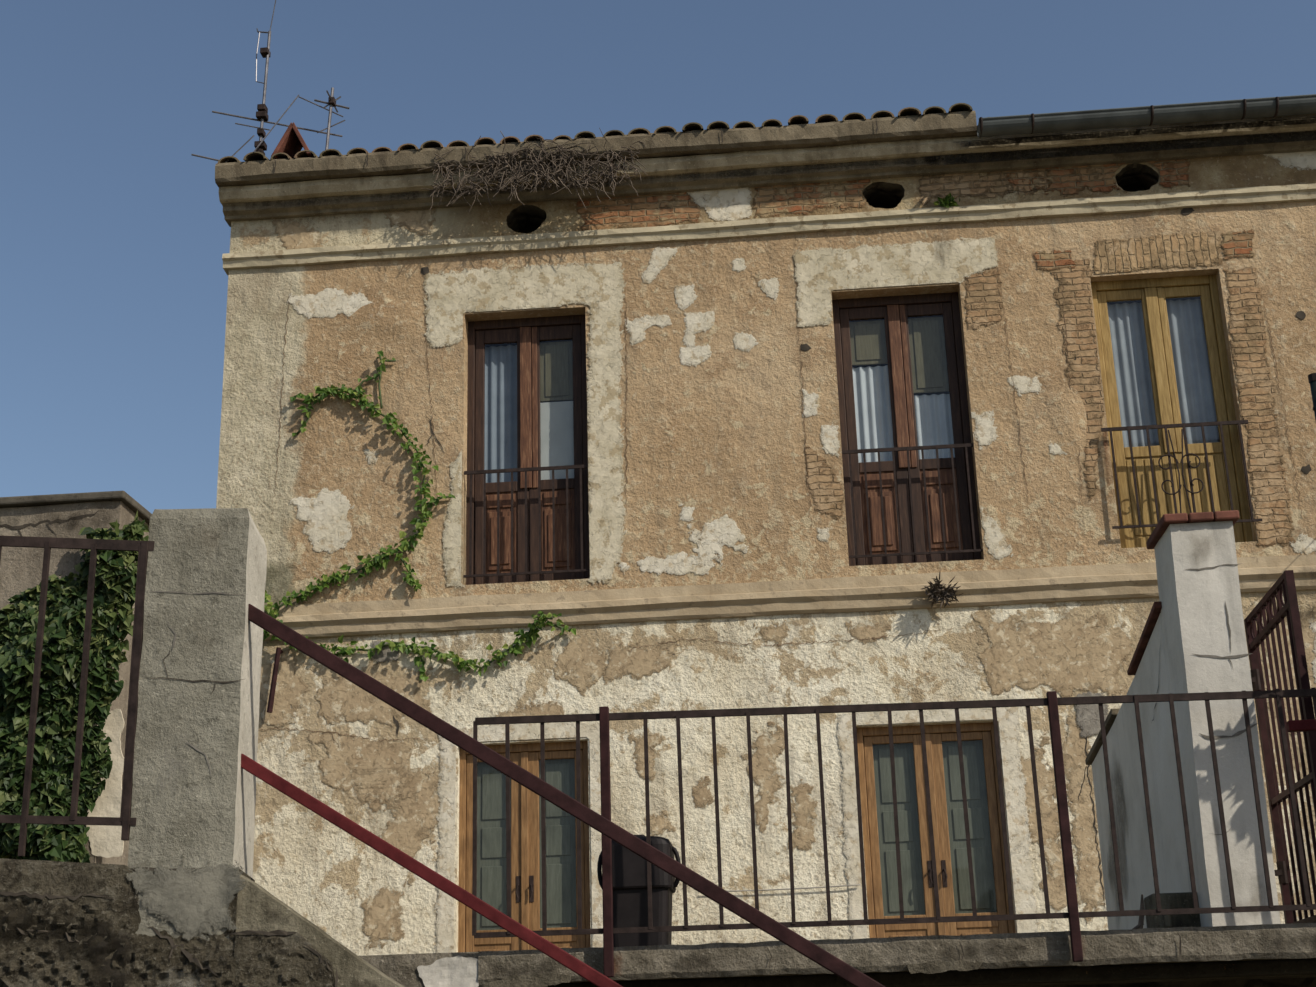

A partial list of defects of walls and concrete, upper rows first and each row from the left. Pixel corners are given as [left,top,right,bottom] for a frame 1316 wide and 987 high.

flaking render [576,179,870,231]
peeling [624,284,716,367]
flaking render [1032,229,1316,555]
crack [0,510,106,536]
peeling [289,487,354,554]
peeling [618,502,749,575]
crack [1185,562,1243,570]
crack [146,591,248,694]
crack [1194,602,1253,668]
spalling [260,649,441,858]
crack [1199,723,1258,739]
spalling [1020,714,1105,923]